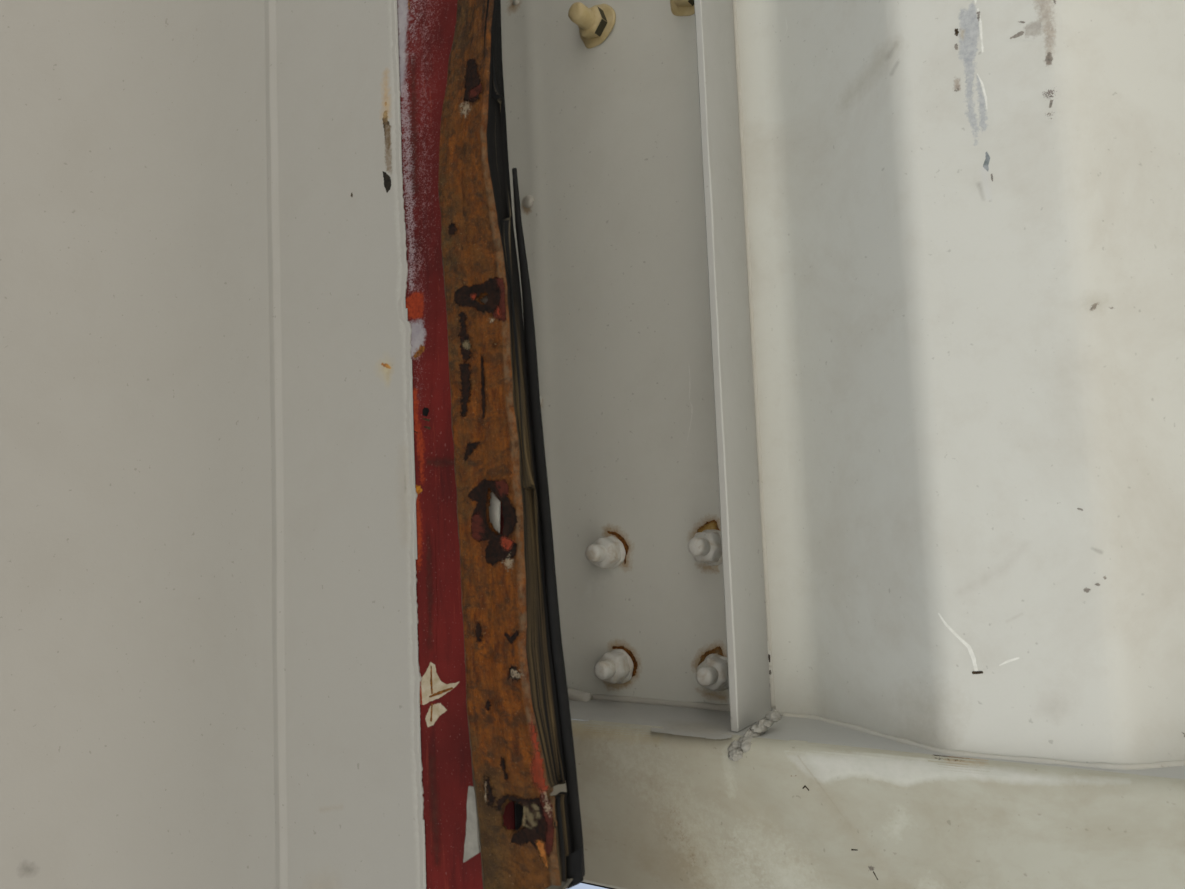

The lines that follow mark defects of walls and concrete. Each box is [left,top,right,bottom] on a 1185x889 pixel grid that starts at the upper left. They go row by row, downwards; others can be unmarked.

rust [458,58,482,117]
peeling [952,0,996,206]
peeling [1036,84,1061,122]
peeling [454,277,507,419]
peeling [376,0,461,889]
peeling [463,442,481,461]
rust [578,520,638,604]
rust [684,510,723,578]
rust [599,634,647,695]
rust [687,636,730,705]